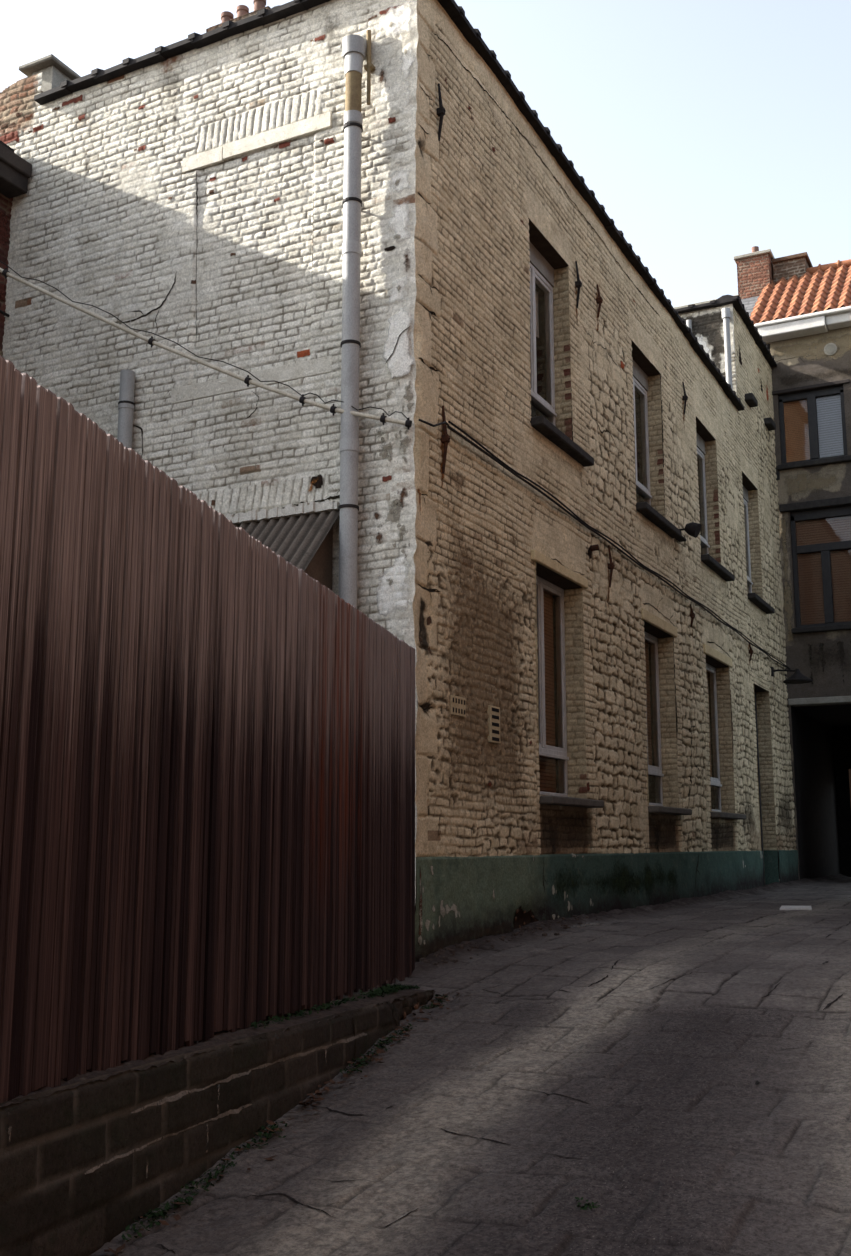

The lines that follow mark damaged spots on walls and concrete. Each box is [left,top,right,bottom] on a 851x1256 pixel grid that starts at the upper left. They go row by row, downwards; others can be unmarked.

flaking render [368,4,405,35]
flaking render [0,211,10,245]
peeling [418,865,460,945]
spalling [514,885,572,929]